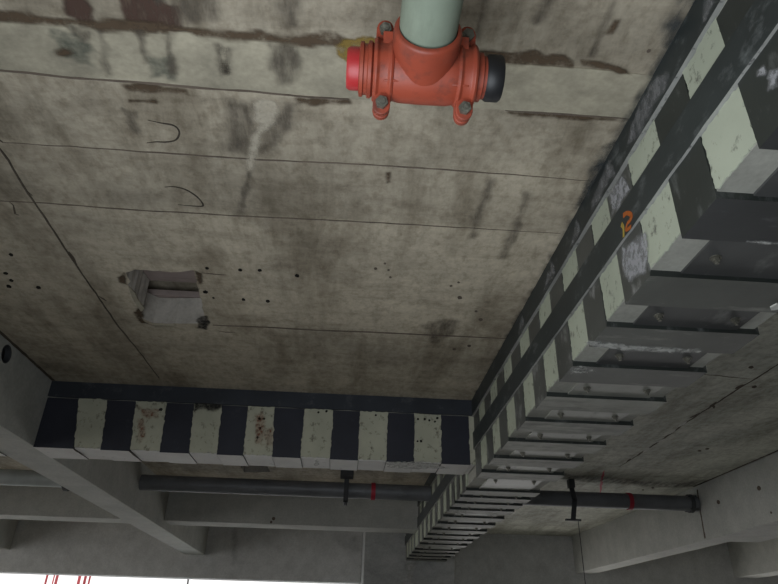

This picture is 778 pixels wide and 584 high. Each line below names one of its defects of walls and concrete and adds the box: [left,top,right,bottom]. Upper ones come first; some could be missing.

water stain [0,0,344,78]
crack [0,69,349,100]
water stain [297,98,351,106]
water stain [230,100,290,177]
crack [0,140,588,381]
spalling [118,275,175,327]
spalling [197,316,210,330]